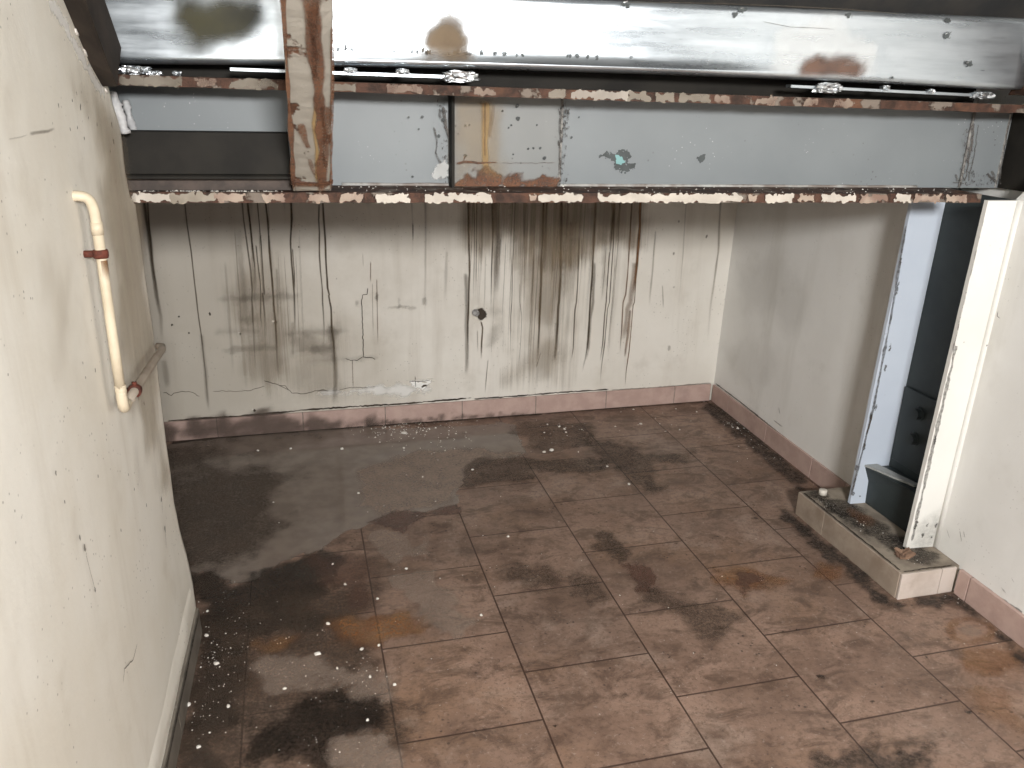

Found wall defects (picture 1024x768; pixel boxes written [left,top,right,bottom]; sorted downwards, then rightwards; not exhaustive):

water stain [175,0,263,51]
corrosion [280,0,334,189]
peeling [308,192,411,204]
peeling [425,100,493,204]
corrosion [455,102,560,187]
peeling [529,89,730,203]
peeling [598,123,1009,204]
water stain [318,203,334,348]
crack [347,289,374,361]
water stain [465,202,638,364]
crack [164,381,376,396]
water stain [164,409,680,768]